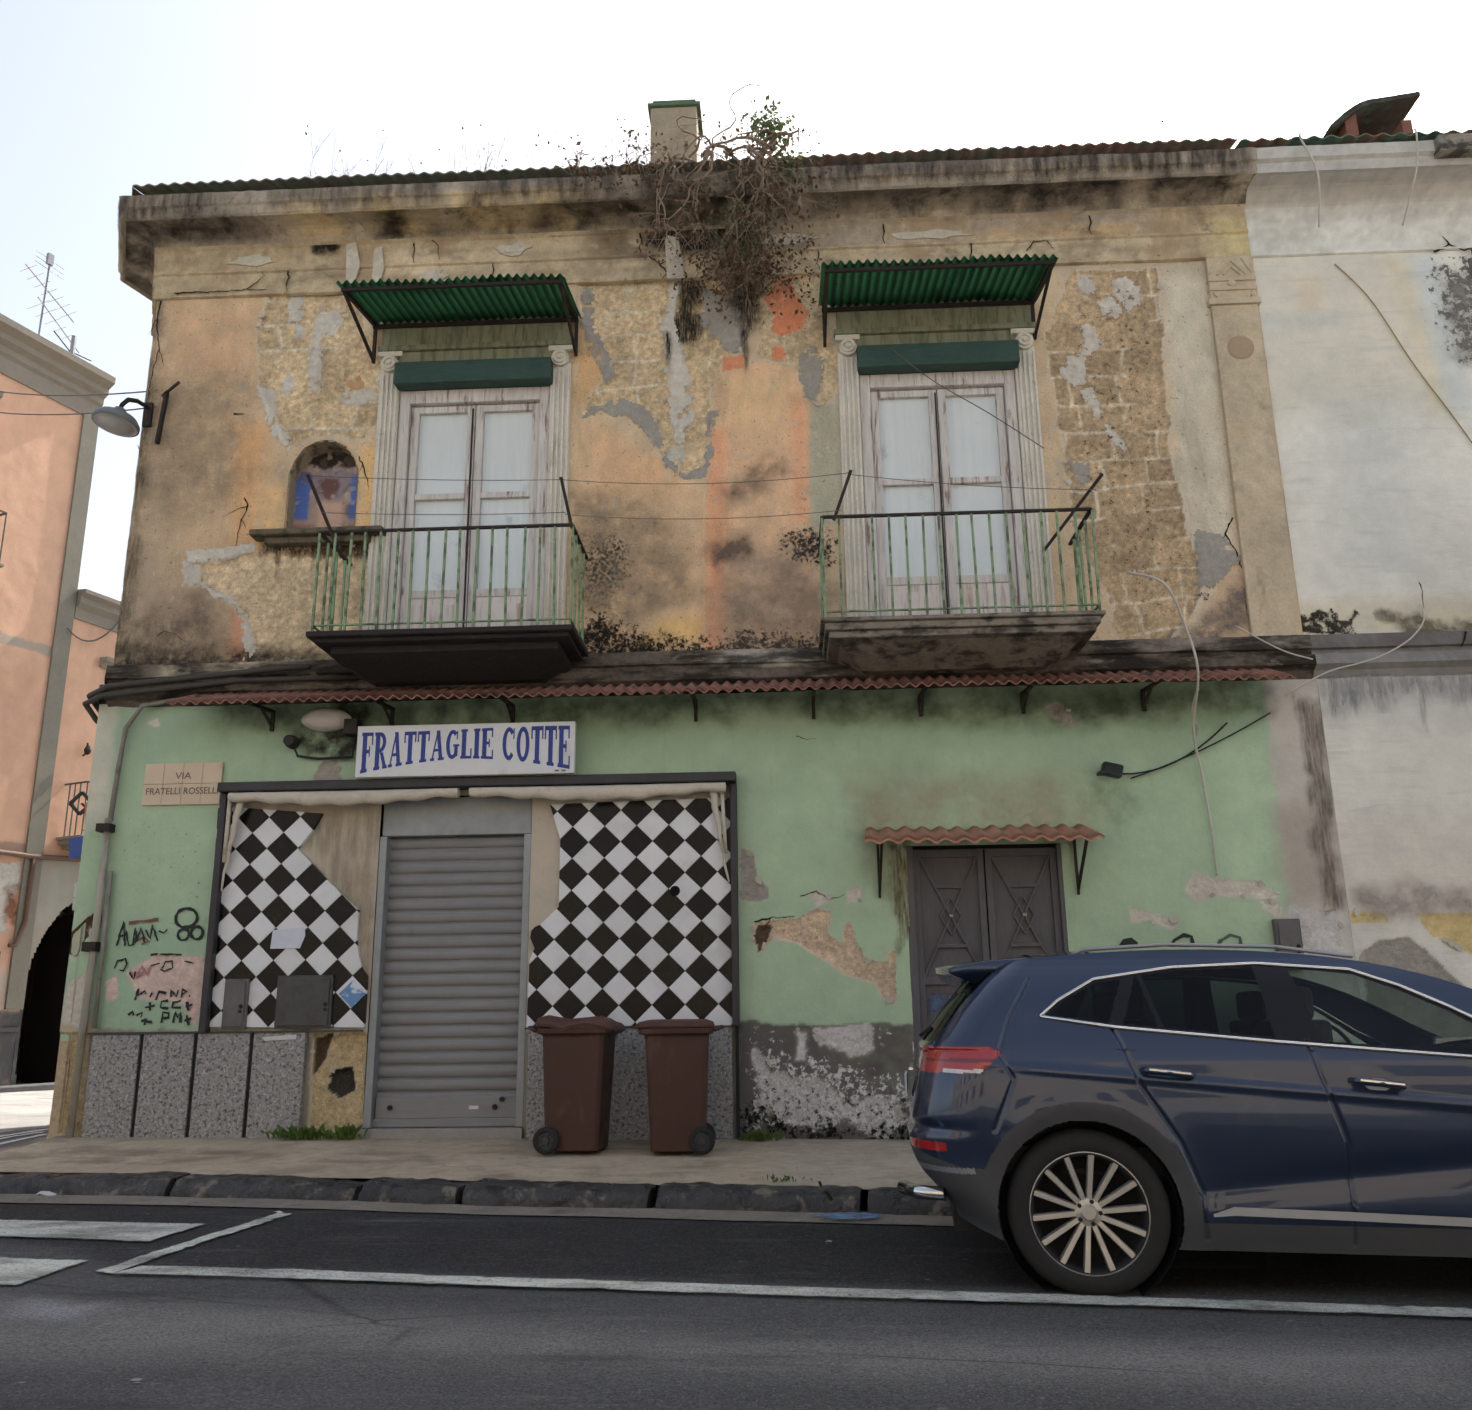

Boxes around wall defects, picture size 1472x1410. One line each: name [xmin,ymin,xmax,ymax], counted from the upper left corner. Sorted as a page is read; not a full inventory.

leakage [1427,256,1472,363]
flaking render [256,294,381,447]
flaking render [578,276,839,473]
flaking render [1046,268,1201,640]
flaking render [190,545,369,660]
leakage [577,505,819,653]
leakage [779,519,842,578]
peeling [749,887,898,1003]
flaking render [1186,872,1472,1044]
flaking render [309,1027,368,1137]
leakage [740,1026,910,1140]
peeling [752,1021,909,1139]